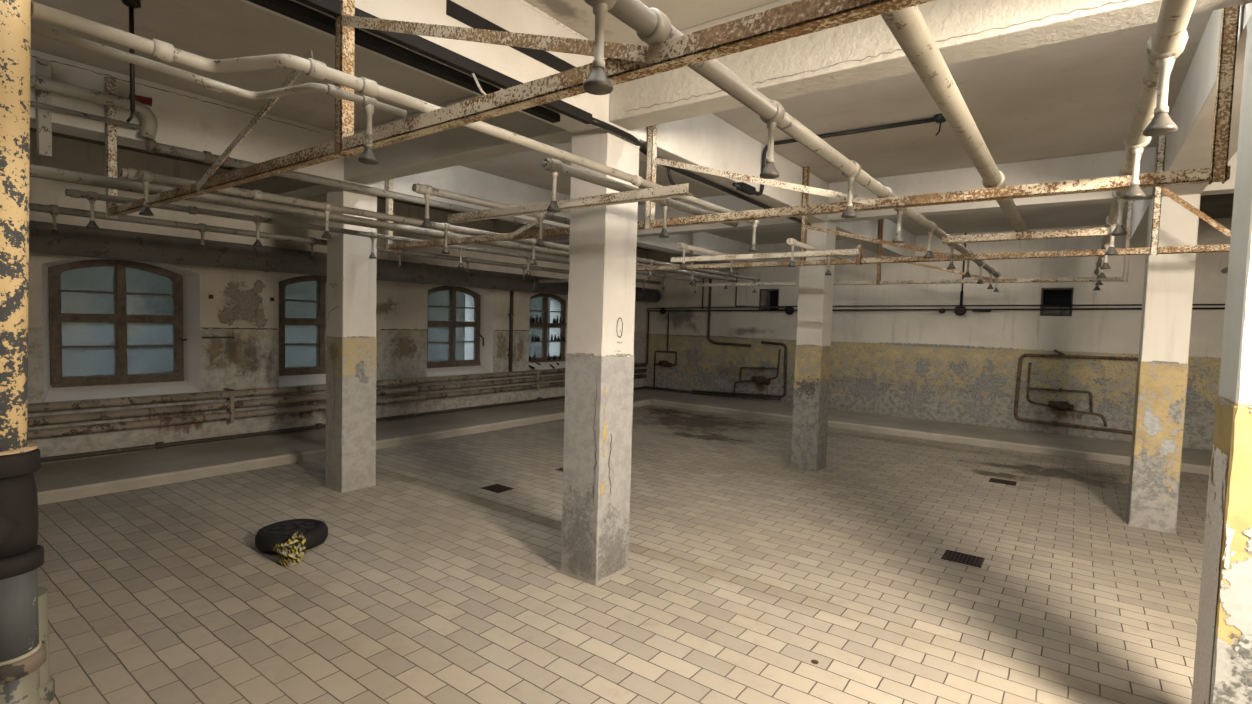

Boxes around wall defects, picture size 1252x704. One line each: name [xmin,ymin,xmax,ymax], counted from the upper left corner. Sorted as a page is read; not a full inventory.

peeling [218,275,271,330]
leakage [979,464,1114,487]
peeling [1139,378,1218,506]
peeling [1191,444,1252,704]